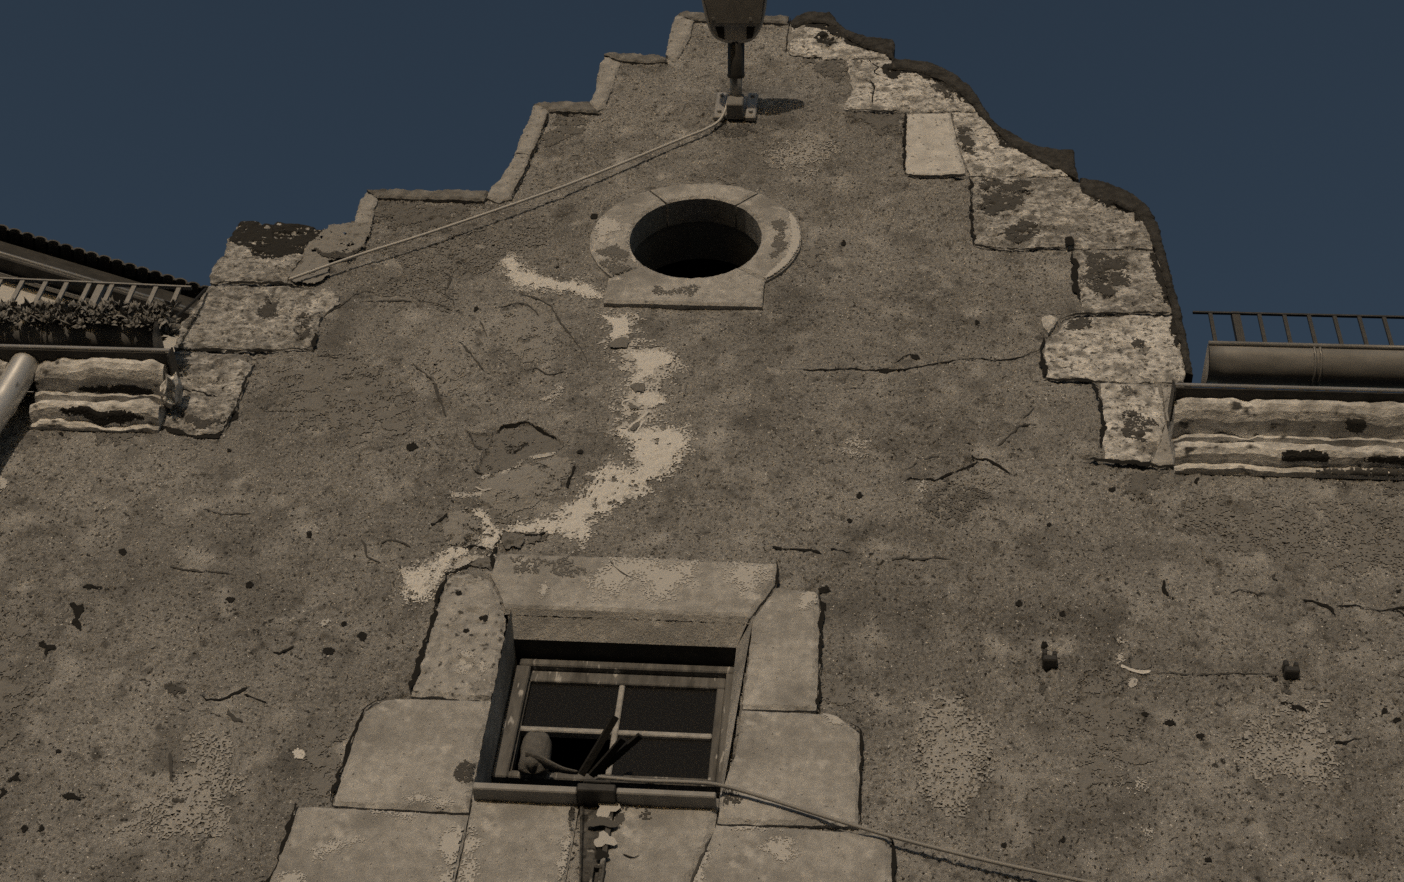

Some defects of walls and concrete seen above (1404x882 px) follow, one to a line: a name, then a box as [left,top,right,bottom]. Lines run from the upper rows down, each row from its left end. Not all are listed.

spalling [1004,219,1040,243]
spalling [290,221,372,284]
damp [596,243,632,275]
crack [779,59,1199,483]
damp [652,284,701,297]
spalling [165,410,239,439]
peeling [386,252,698,614]
peeling [834,432,871,459]
damp [510,555,587,577]